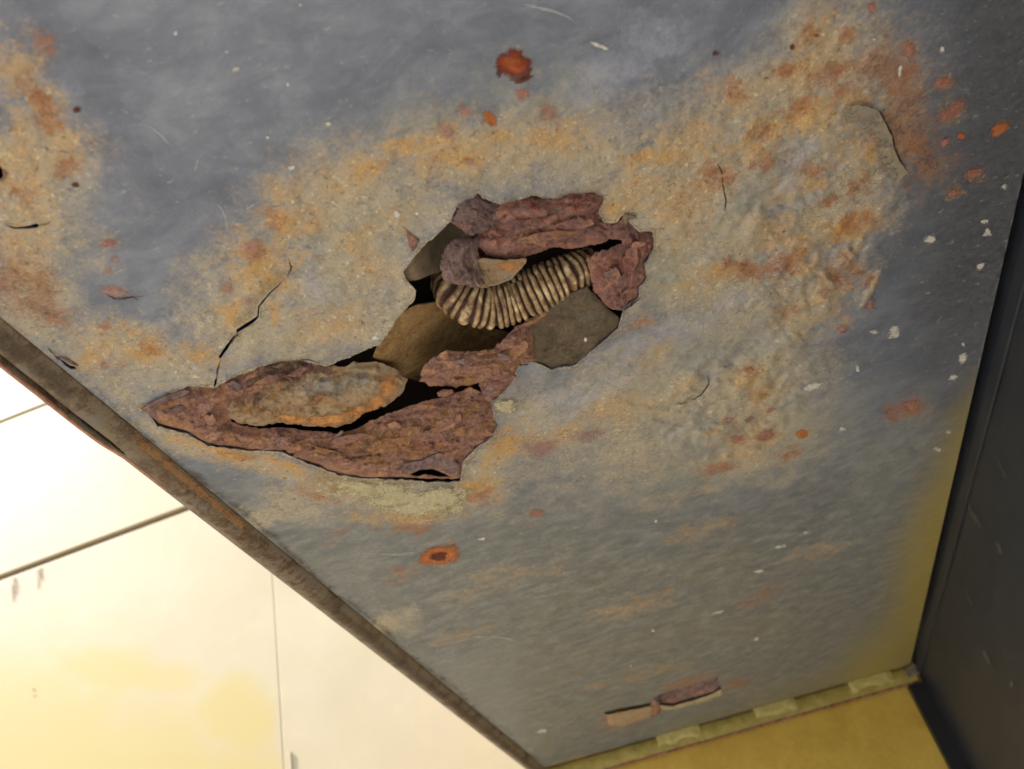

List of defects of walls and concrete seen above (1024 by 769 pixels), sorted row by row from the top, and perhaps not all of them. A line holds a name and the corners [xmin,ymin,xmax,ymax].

peeling [391,211,419,252]
peeling [516,219,594,244]
peeling [610,247,639,287]
crack [216,259,292,375]
corrosion [0,0,1021,597]
peeling [606,706,653,726]